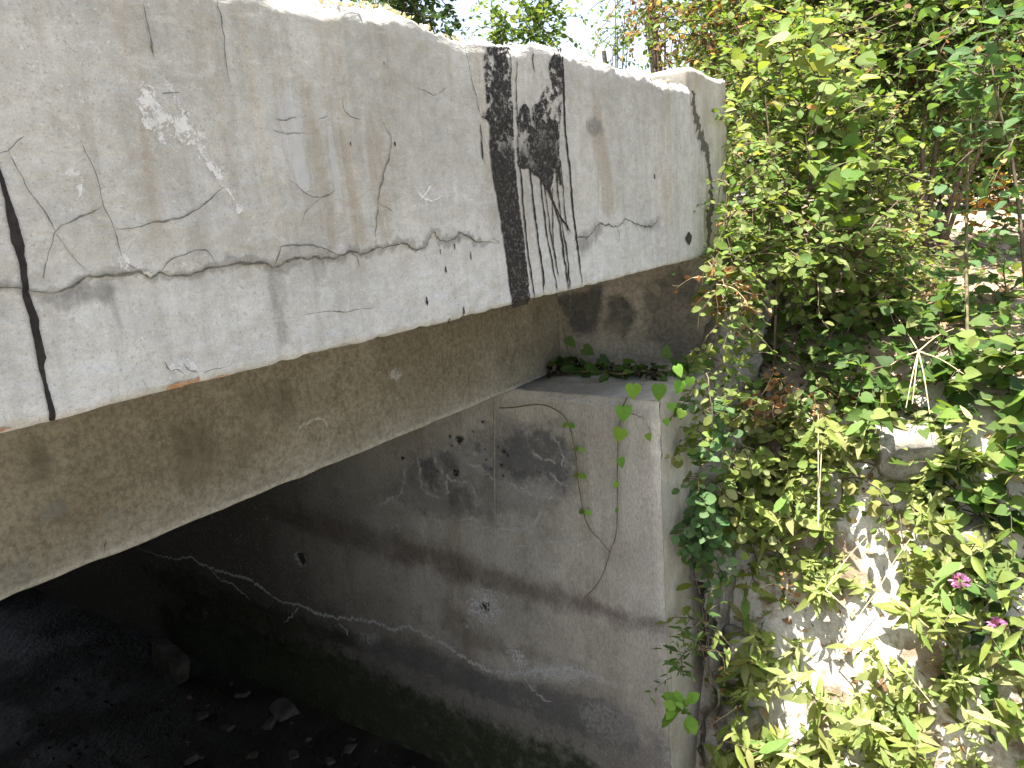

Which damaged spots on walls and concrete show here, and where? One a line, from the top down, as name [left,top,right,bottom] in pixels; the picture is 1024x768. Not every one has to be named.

peeling [137,84,243,214]
crack [0,99,500,294]
leakage [480,46,530,308]
crack [574,218,658,243]
leakage [558,285,633,334]
leakage [484,431,563,481]